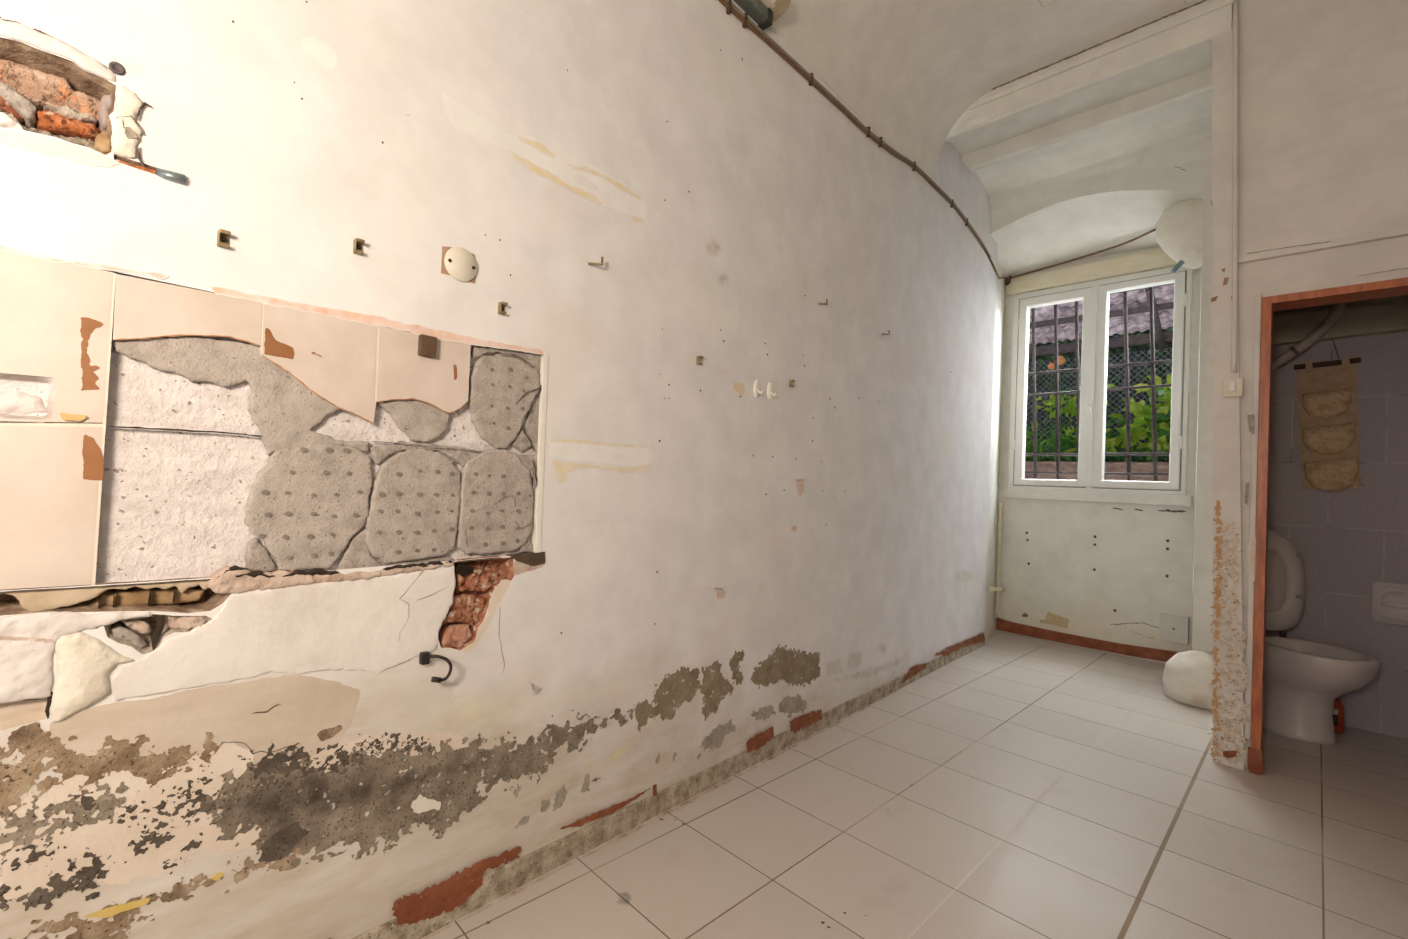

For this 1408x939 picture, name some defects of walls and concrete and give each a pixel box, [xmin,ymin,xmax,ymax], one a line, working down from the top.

spalling [0,18,152,167]
flaking render [105,270,214,293]
flaking render [0,312,545,654]
leakage [678,641,768,669]
flaking render [1207,500,1252,767]
leakage [0,765,227,917]
leakage [258,821,309,863]
peeling [0,644,820,939]
leakage [241,665,629,806]